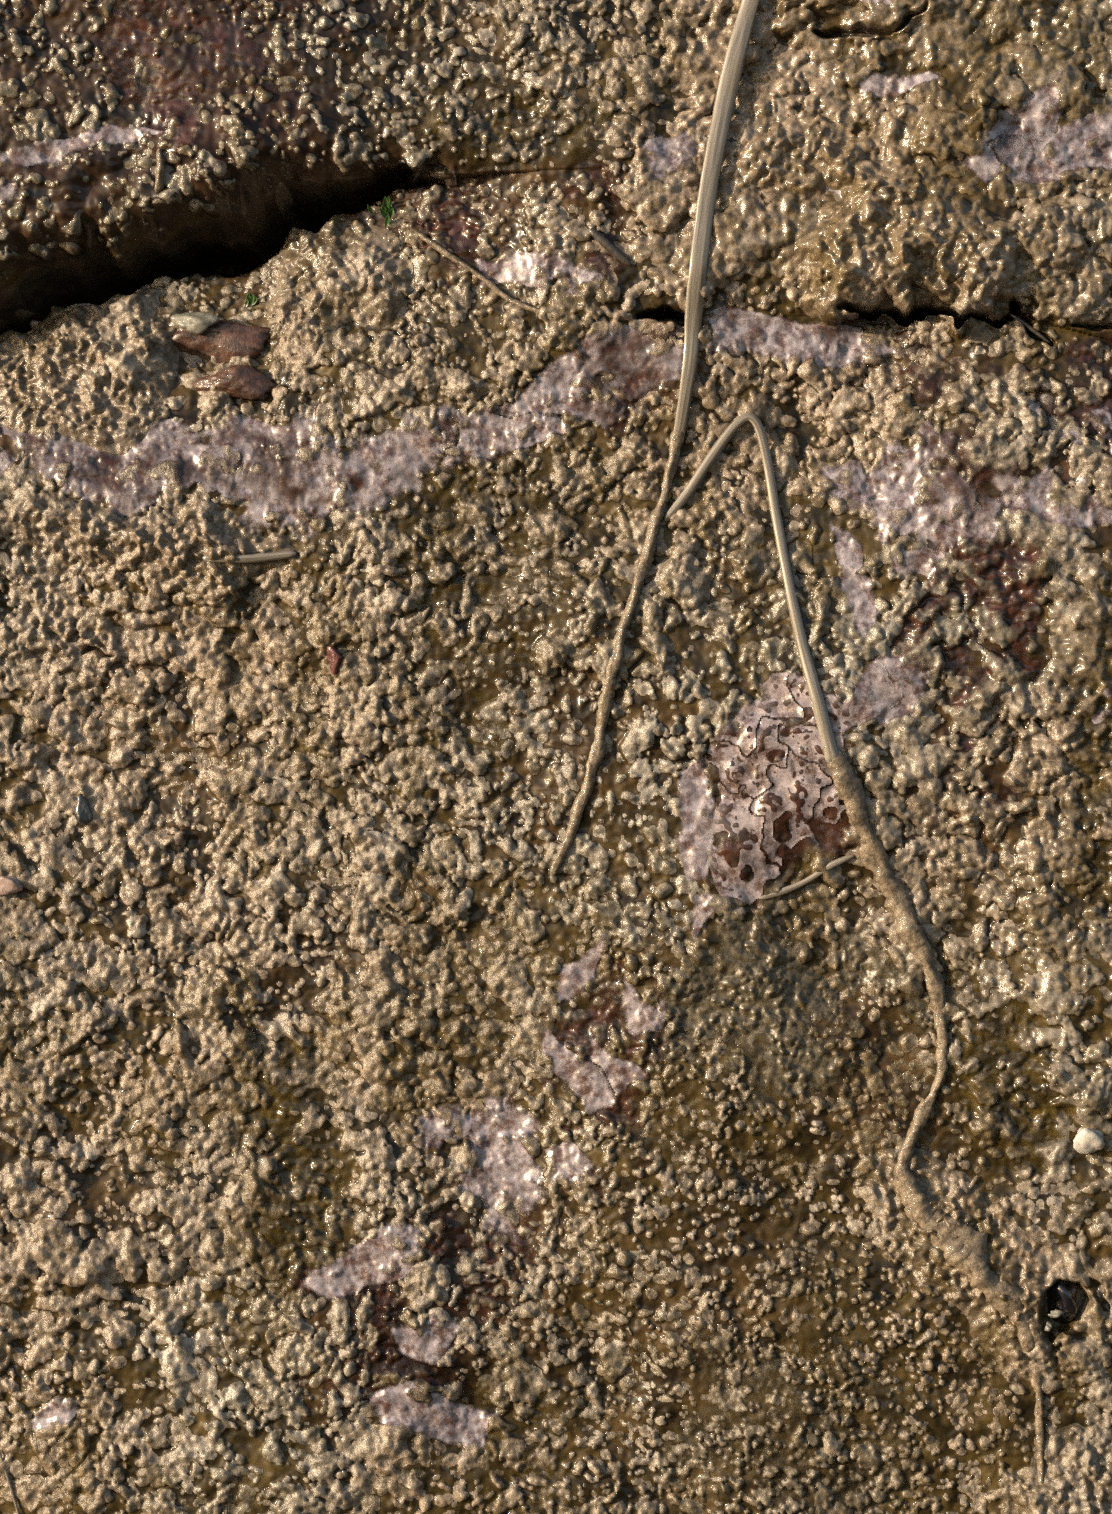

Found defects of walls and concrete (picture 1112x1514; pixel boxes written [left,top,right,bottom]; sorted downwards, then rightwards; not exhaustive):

crack [0,159,457,333]
crack [640,311,685,327]
crack [1008,309,1112,346]